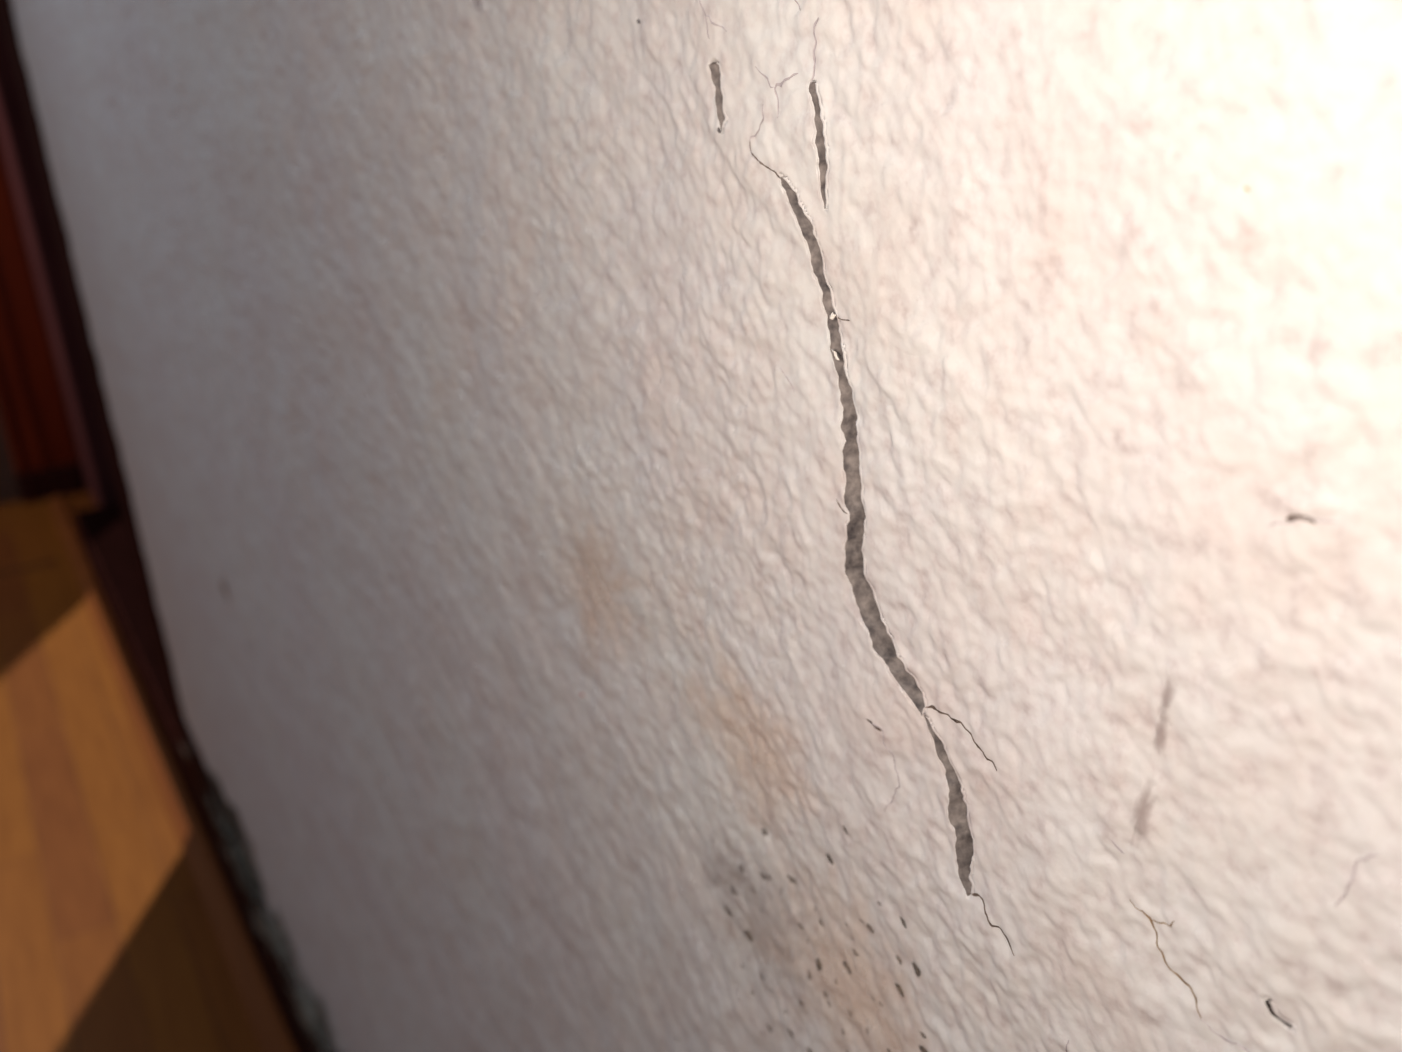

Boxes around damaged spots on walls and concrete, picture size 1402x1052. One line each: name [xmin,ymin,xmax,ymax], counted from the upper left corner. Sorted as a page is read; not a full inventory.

crack [699,0,1014,955]
crack [1129,899,1249,1052]